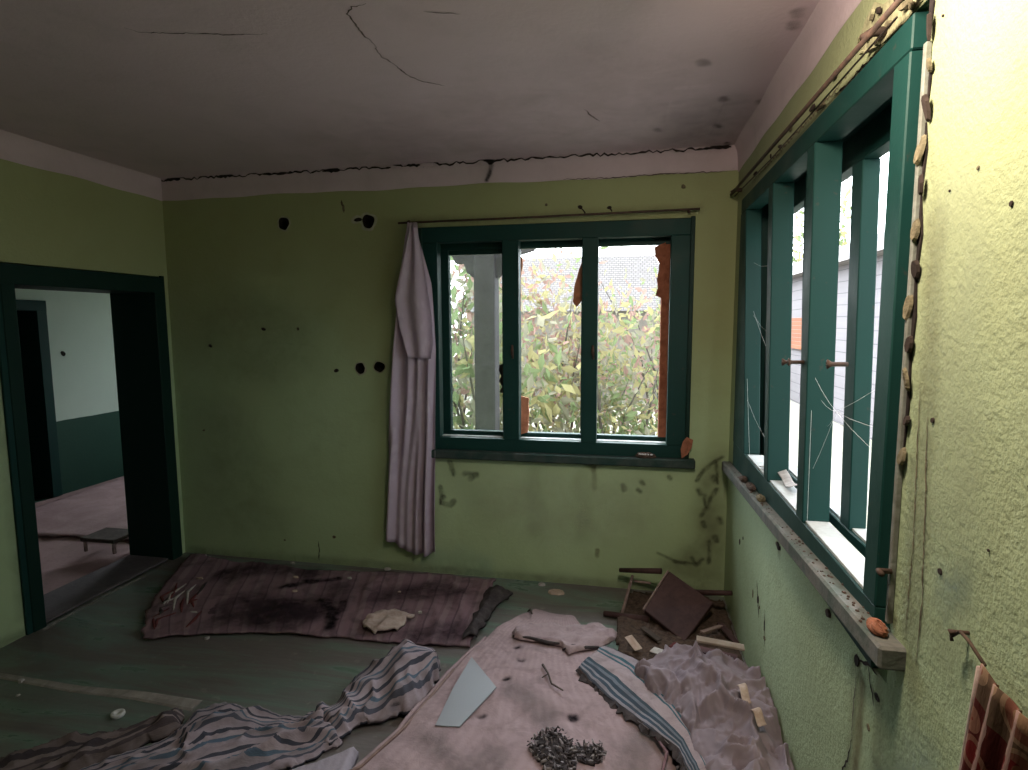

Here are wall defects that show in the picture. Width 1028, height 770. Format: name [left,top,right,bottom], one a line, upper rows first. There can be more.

crack [346,3,443,86]
spalling [834,0,944,94]
crack [161,145,731,182]
spalling [897,57,932,466]